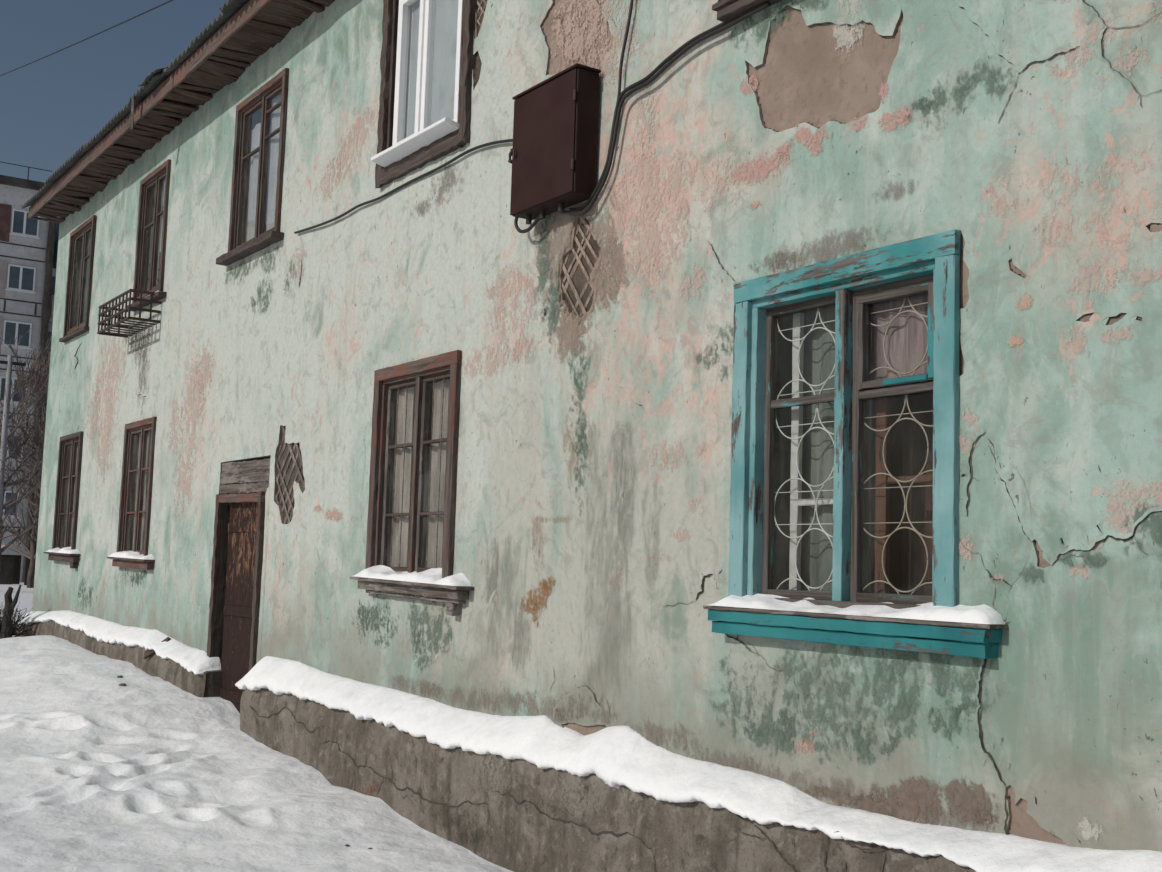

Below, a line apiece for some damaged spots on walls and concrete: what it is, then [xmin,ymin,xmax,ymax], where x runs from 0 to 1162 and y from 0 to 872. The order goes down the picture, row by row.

flaking render [534,0,640,91]
flaking render [730,0,914,185]
crack [955,0,1162,124]
spalling [557,214,604,325]
peeling [1031,151,1162,353]
spalling [270,415,343,535]
crack [959,421,1162,624]
leakage [358,595,452,694]
crack [250,706,655,867]
leakage [713,646,992,763]
spalling [806,771,1083,848]
crack [967,657,1008,835]